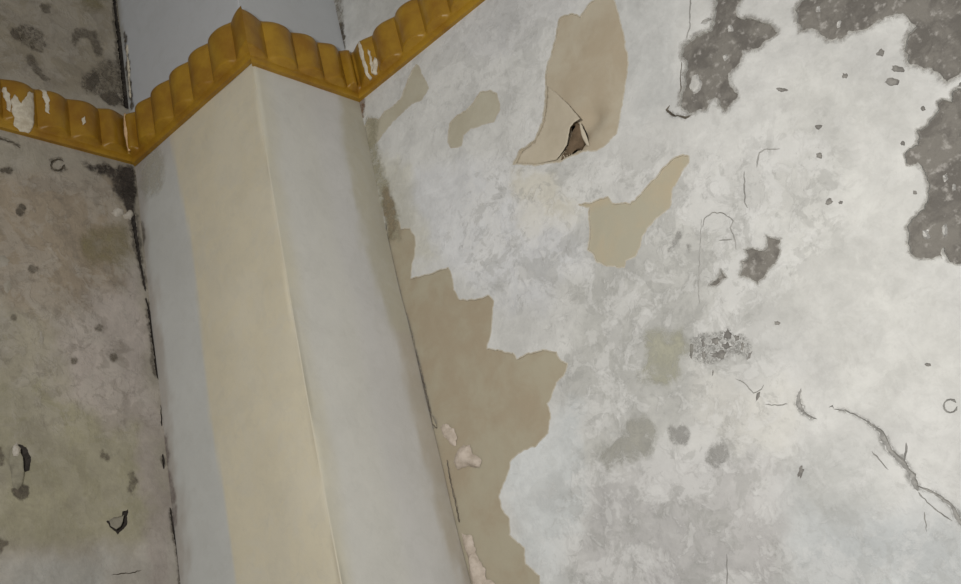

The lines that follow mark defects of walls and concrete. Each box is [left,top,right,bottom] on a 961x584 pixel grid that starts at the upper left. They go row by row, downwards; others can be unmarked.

peeling [2,87,50,133]
peeling [358,41,378,80]
peeling [365,64,429,144]
peeling [447,90,500,148]
peeling [512,0,629,166]
spalling [678,0,779,116]
spalling [793,0,961,266]
peeling [578,154,690,268]
spalling [708,234,781,287]
peeling [386,219,568,584]
spalling [689,329,752,376]
crack [735,378,961,532]